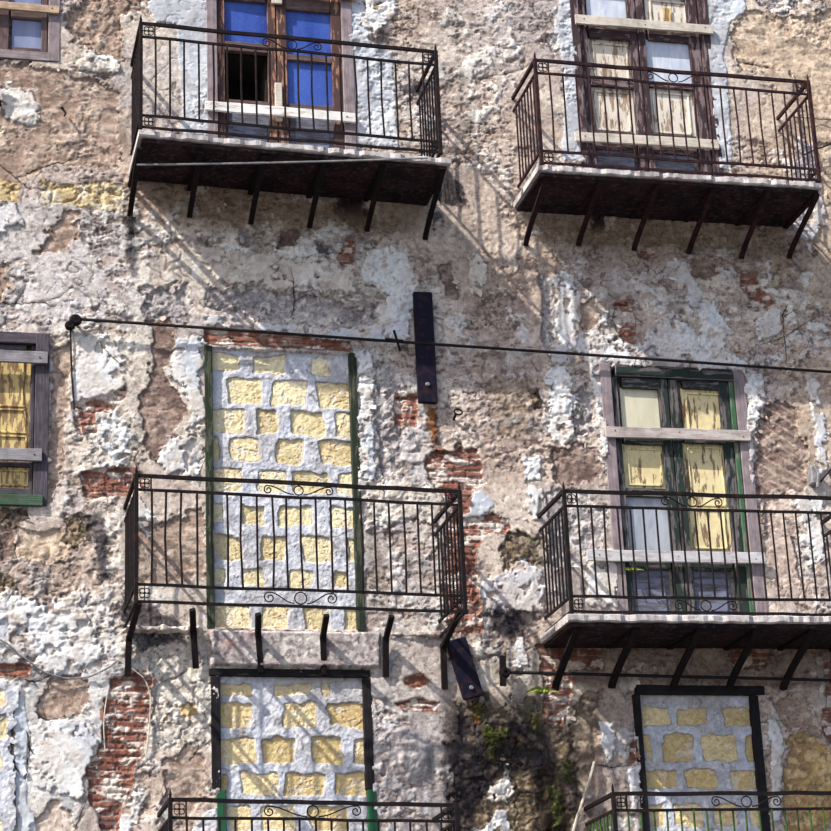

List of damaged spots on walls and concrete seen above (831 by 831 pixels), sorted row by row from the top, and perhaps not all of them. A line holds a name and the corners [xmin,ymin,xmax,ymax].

crack [0,155,94,190]
peeling [47,228,831,659]
peeling [0,506,92,566]
flaking render [0,573,215,831]
flaking render [395,672,439,712]
spalling [447,643,617,831]
water stain [533,762,573,831]
peeling [767,659,831,831]